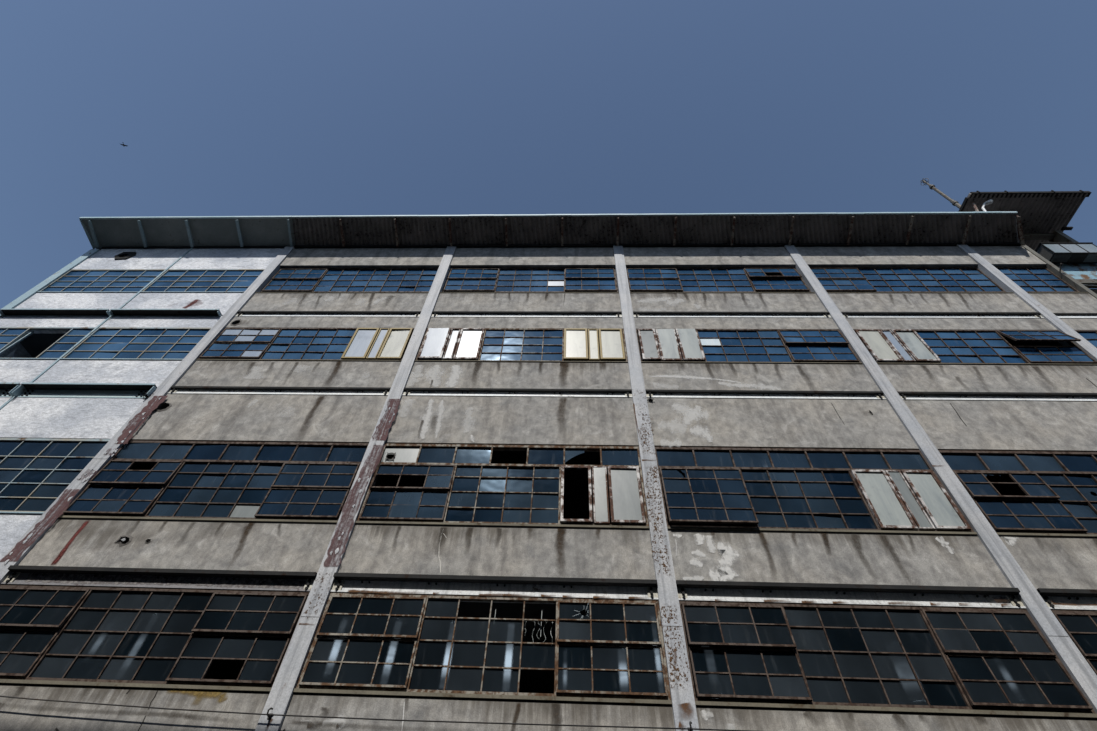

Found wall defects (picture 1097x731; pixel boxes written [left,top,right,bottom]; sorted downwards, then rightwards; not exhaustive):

damp [407,362,481,387]
damp [420,399,444,439]
corrosion [633,403,670,574]
corrosion [52,521,89,564]
corrosion [661,606,689,688]